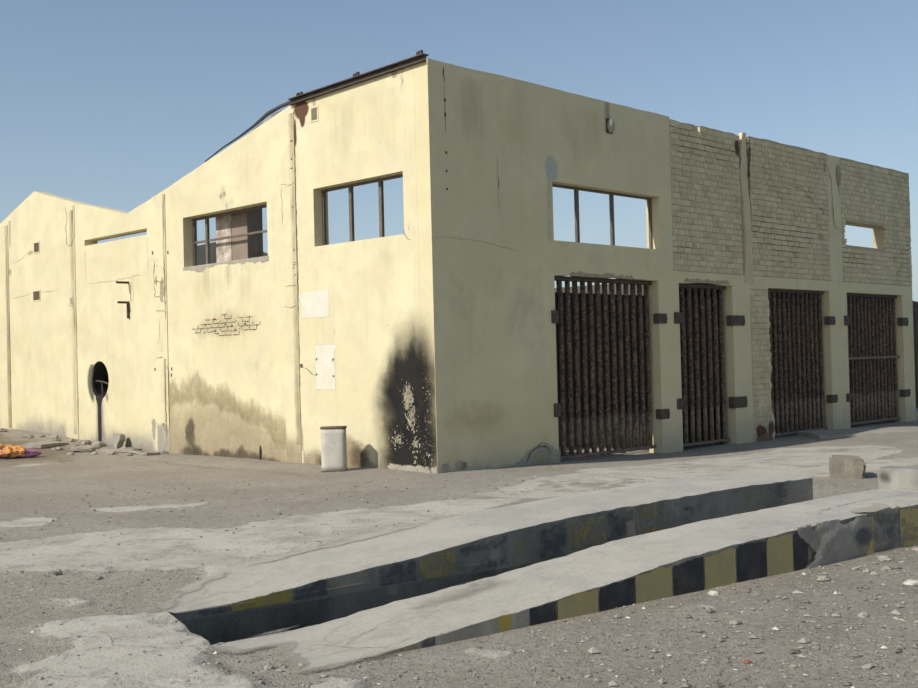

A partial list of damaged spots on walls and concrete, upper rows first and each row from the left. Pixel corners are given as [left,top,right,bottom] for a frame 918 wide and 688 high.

corrosion [294,102,308,145]
leakage [170,417,322,465]
leakage [347,440,372,468]
spalling [798,515,876,569]
spalling [180,568,496,645]